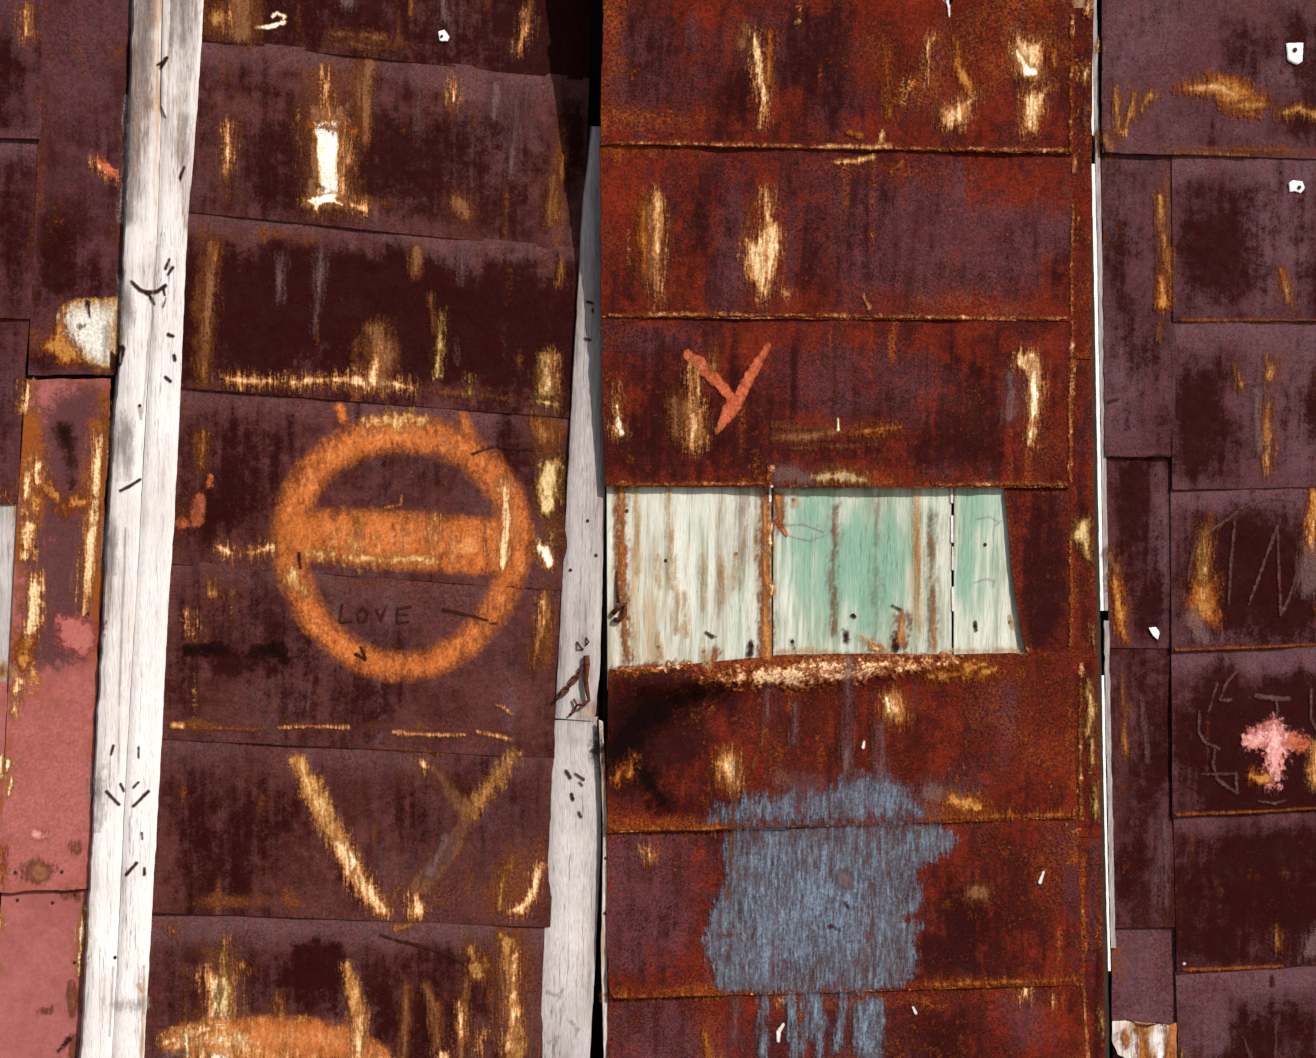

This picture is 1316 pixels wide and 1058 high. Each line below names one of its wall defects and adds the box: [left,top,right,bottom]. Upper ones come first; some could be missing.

corrosion [220,116,243,201]
corrosion [614,0,1080,174]
corrosion [1095,69,1316,162]
corrosion [190,236,514,401]
corrosion [607,186,1075,487]
corrosion [75,398,112,622]
corrosion [213,538,280,561]
corrosion [710,716,768,798]
corrosion [878,686,914,732]
corrosion [924,663,1084,836]
corrosion [453,930,539,1058]
corrosion [1116,1022,1187,1058]